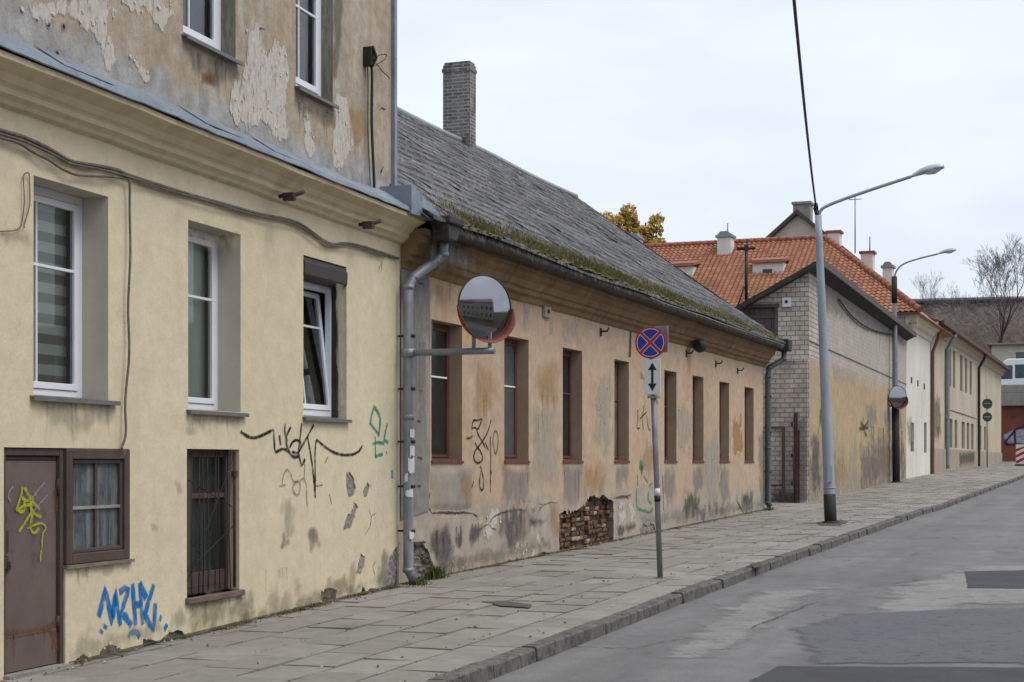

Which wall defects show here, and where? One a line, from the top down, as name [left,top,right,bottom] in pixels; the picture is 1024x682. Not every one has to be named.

peeling [20,0,174,83]
peeling [230,23,290,142]
peeling [301,104,316,158]
peeling [332,93,353,171]
water stain [862,408,913,482]
spalling [343,470,371,530]
spalling [356,541,400,594]
spalling [413,543,467,579]
water stain [431,522,480,563]
flaking render [508,494,655,562]